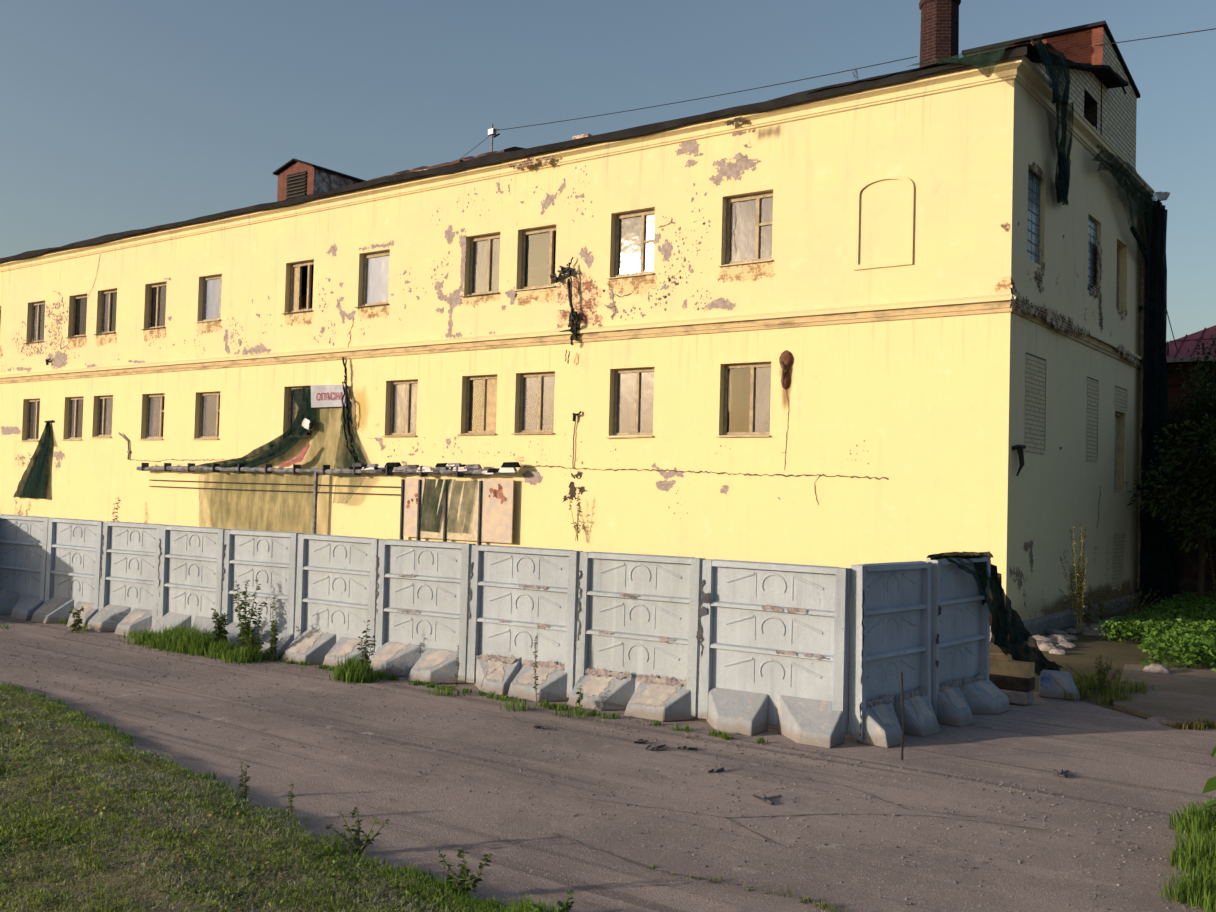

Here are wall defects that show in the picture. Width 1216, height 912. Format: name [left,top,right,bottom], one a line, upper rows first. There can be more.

spalling [508,155,555,169]
peeling [675,117,761,187]
peeling [540,178,585,215]
peeling [653,233,673,261]
spalling [252,225,669,338]
spalling [702,258,775,311]
spalling [993,236,1103,337]
spalling [0,290,175,372]
crack [523,389,889,505]
peeling [651,463,683,492]
peeling [1010,539,1034,591]